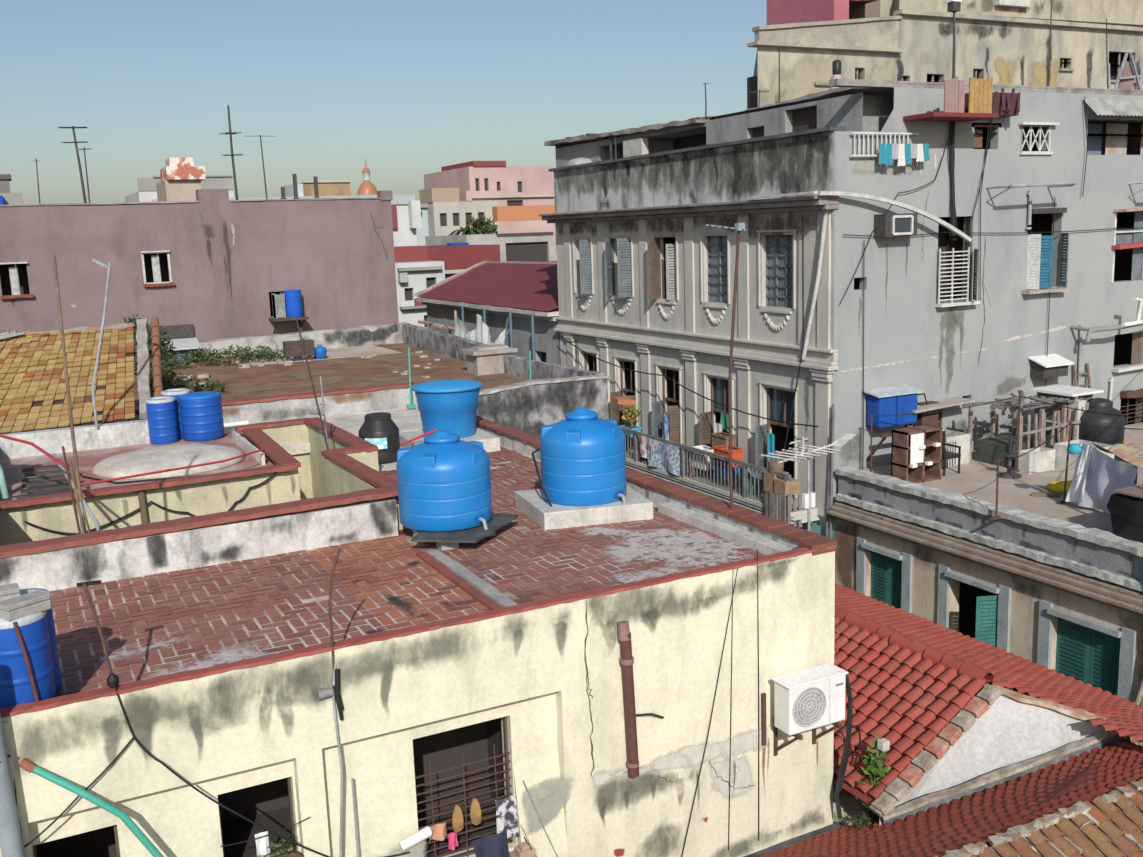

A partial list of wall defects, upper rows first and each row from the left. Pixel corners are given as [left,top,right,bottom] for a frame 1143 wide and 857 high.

flaking render [995,59,1015,85]
flaking render [1030,63,1059,87]
damp [557,133,831,206]
damp [581,527,750,629]
damp [739,562,787,588]
damp [387,596,422,617]
damp [99,637,180,660]
damp [154,645,264,683]
damp [294,633,464,706]
damp [556,616,566,650]
damp [73,678,245,761]
damp [22,727,59,761]